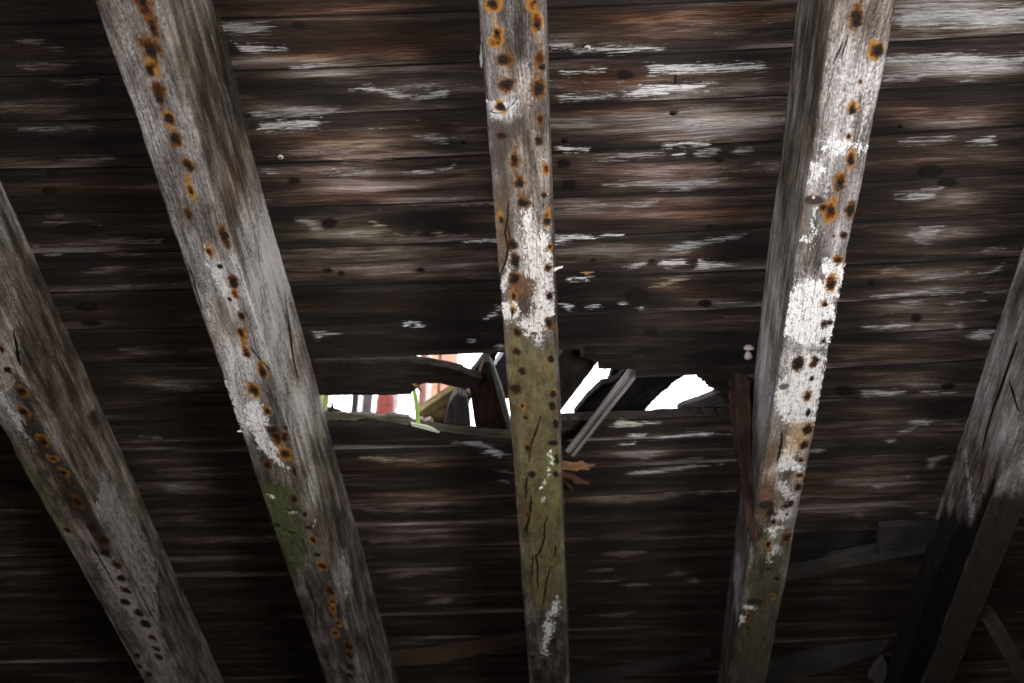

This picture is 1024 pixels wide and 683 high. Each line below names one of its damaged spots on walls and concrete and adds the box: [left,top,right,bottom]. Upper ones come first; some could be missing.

corrosion [133,0,197,220]
corrosion [484,0,517,114]
corrosion [526,0,547,99]
corrosion [495,132,552,229]
corrosion [820,133,856,223]
crack [499,202,511,278]
corrosion [508,238,522,354]
water stain [509,274,534,319]
corrosion [820,255,843,307]
corrosion [205,222,327,570]
corrosion [764,355,820,524]
crack [524,416,556,605]